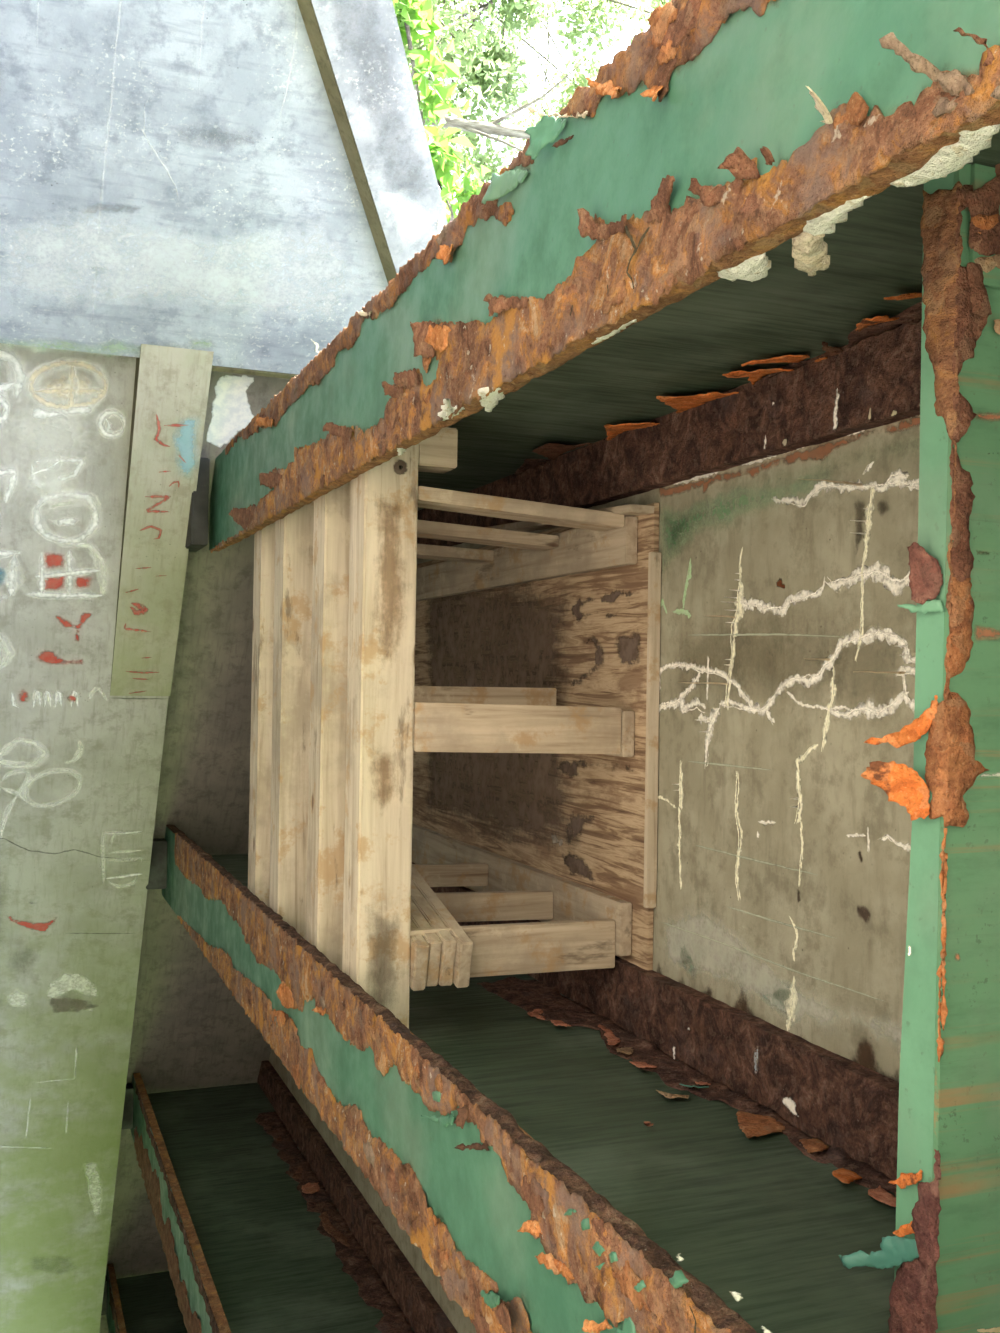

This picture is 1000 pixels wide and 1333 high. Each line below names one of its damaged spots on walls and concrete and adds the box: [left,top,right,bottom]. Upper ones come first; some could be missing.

corrosion [211,0,1000,553]
corrosion [505,164,1000,1062]
corrosion [134,1084,220,1333]
corrosion [166,825,757,1333]
corrosion [477,977,942,1333]